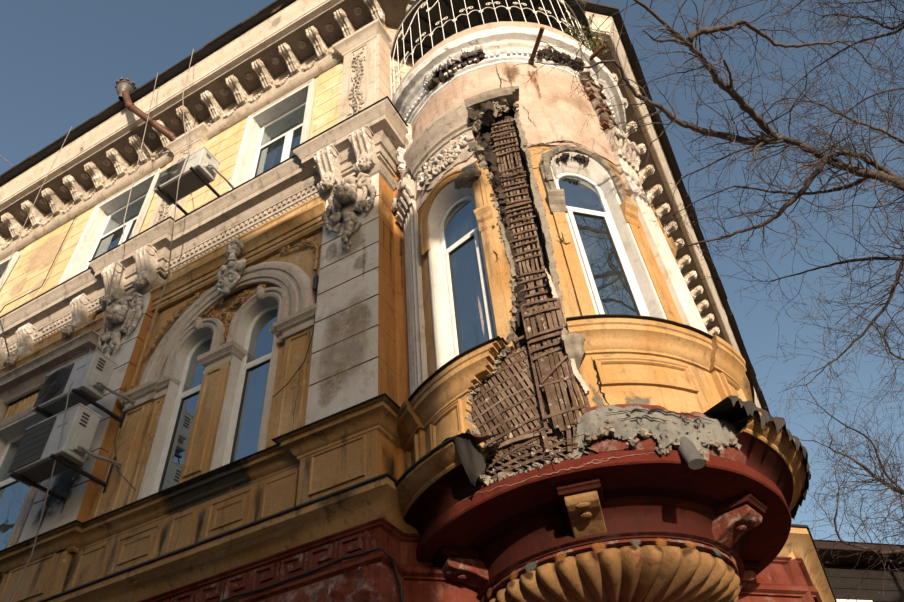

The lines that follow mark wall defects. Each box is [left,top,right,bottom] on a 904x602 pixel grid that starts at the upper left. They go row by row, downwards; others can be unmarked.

spalling [537,48,619,133]
spalling [442,98,615,486]
peeling [696,437,742,461]
water stain [36,457,88,529]
water stain [161,461,251,543]